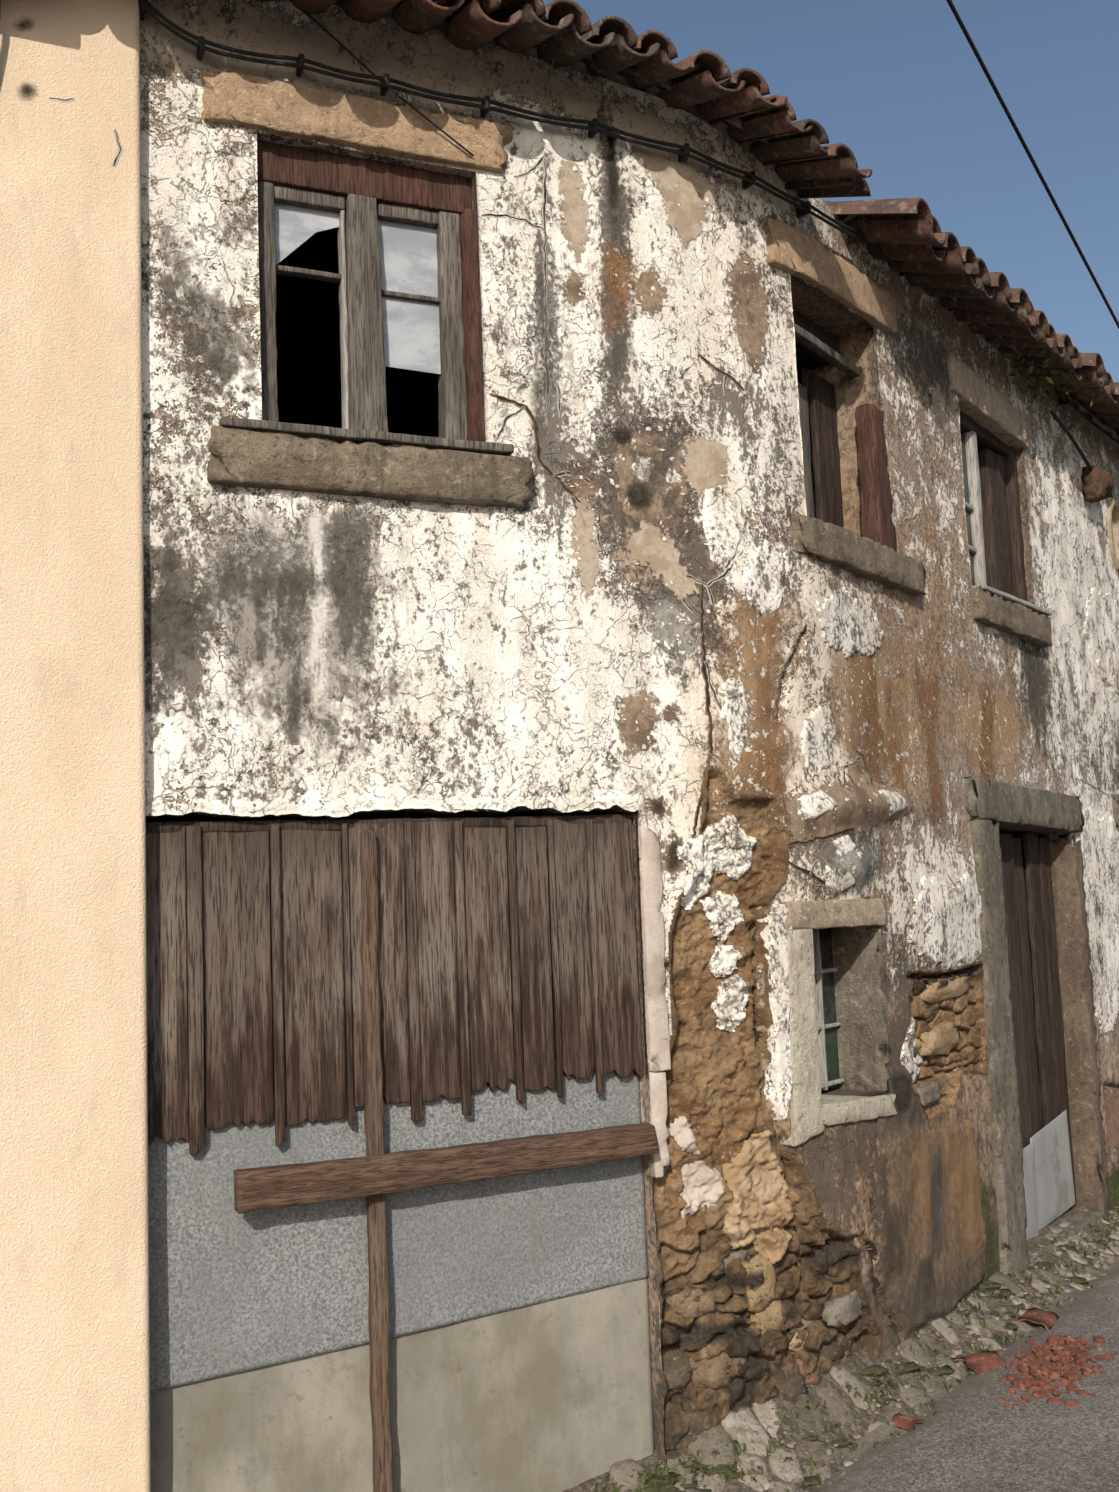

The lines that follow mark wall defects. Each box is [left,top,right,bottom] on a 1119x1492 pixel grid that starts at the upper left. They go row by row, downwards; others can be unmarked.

damp [147,224,258,395]
damp [224,196,255,238]
crack [481,156,603,551]
peeling [558,155,590,306]
peeling [630,266,667,317]
peeling [619,134,721,249]
peeling [721,249,769,375]
damp [144,508,423,762]
crack [667,540,749,838]
peeling [815,587,886,659]
peeling [757,901,793,1122]
spalling [900,873,988,1121]